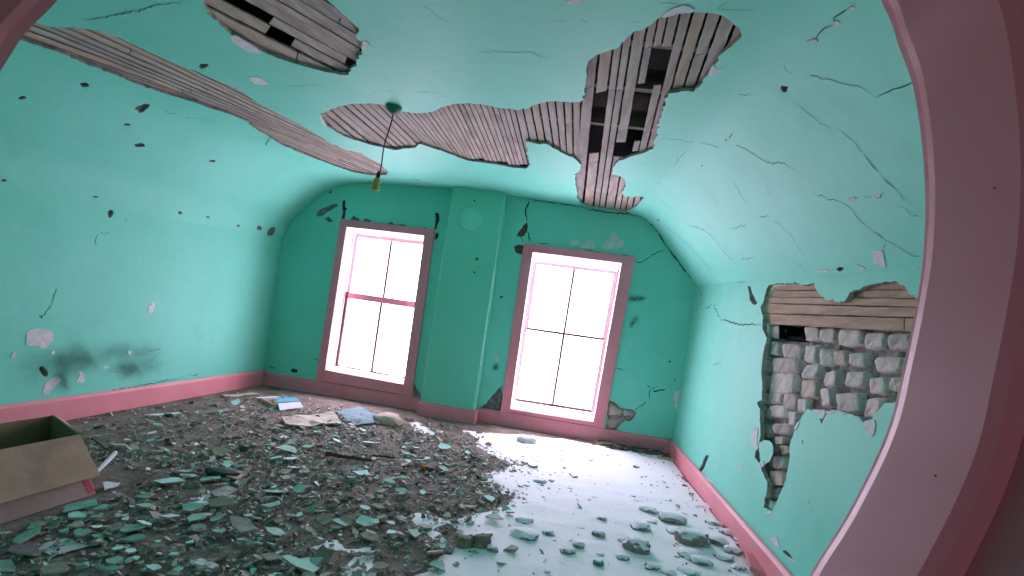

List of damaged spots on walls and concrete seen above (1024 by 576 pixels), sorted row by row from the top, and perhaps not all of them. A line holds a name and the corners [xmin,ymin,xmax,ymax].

crack [92,1,190,20]
crack [807,6,855,43]
peeling [230,35,262,54]
crack [784,67,911,98]
crack [798,106,919,257]
spalling [317,191,371,222]
spalling [475,203,503,411]
peeling [11,328,55,358]
hole [779,325,810,341]
peeling [39,367,85,394]
spalling [606,400,636,430]
peeling [751,426,765,468]